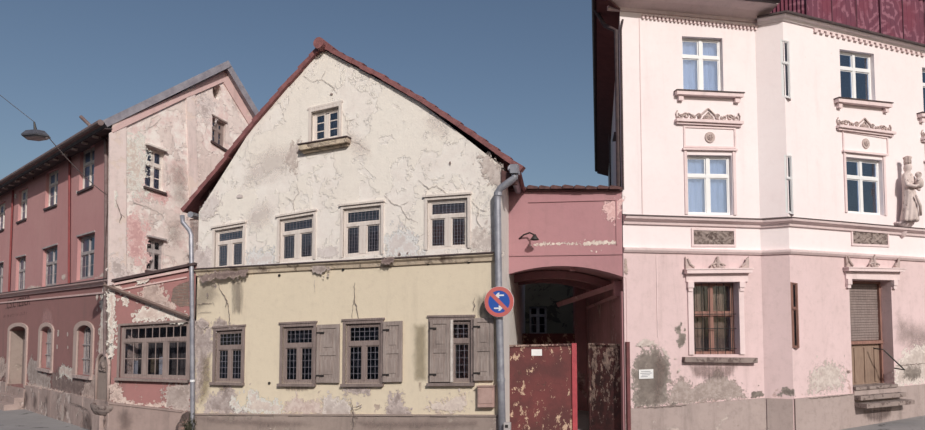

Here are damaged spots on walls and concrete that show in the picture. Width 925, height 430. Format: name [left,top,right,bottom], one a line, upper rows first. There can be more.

peeling [473,152,504,191]
crack [384,180,446,227]
flaking render [95,127,237,359]
crack [198,283,230,323]
flaking render [27,363,95,398]
flaking render [108,378,371,430]
flaking render [384,388,473,417]
flaking render [630,322,765,408]